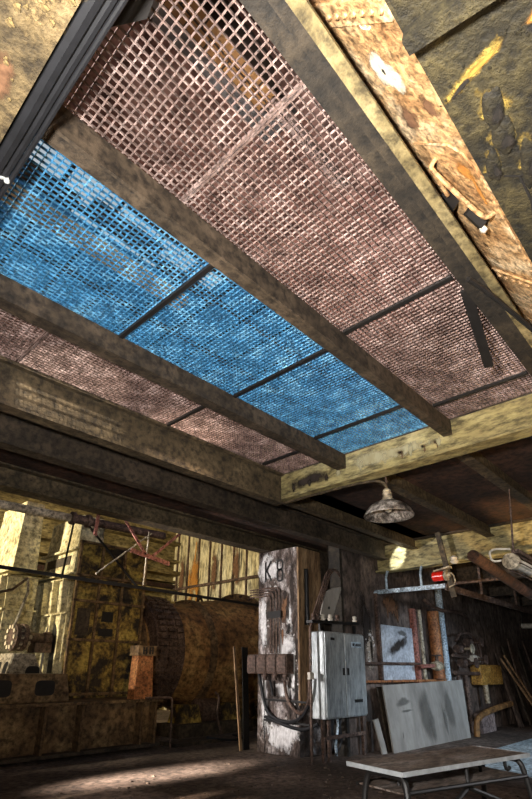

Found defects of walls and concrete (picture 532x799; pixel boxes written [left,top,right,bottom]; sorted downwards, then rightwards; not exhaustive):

corrosion [398,101,420,130]
corrosion [423,97,439,117]